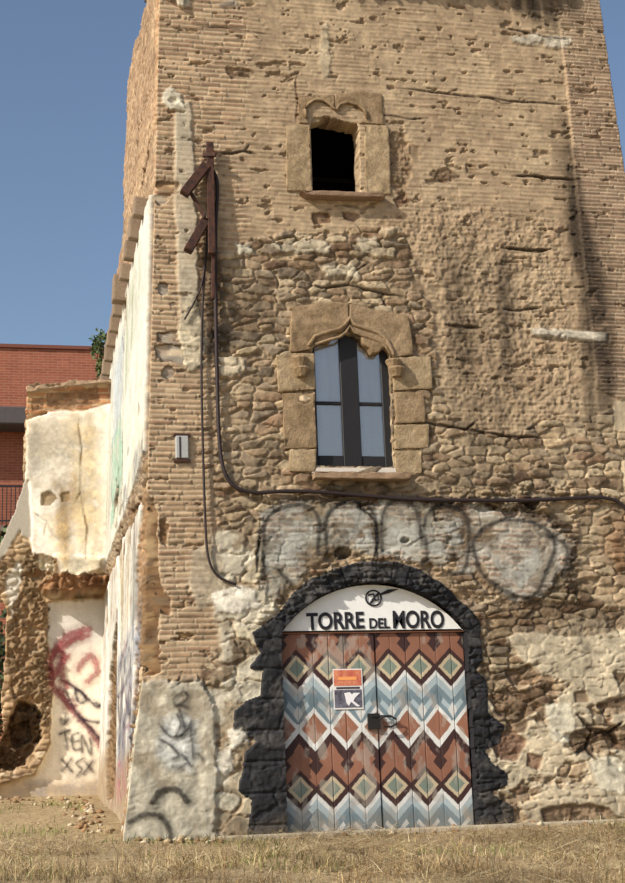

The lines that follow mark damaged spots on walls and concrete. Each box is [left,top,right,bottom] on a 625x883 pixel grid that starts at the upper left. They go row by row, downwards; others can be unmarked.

crack [410,89,556,105]
spalling [41,491,70,505]
spalling [117,478,148,558]
hole [0,702,43,771]